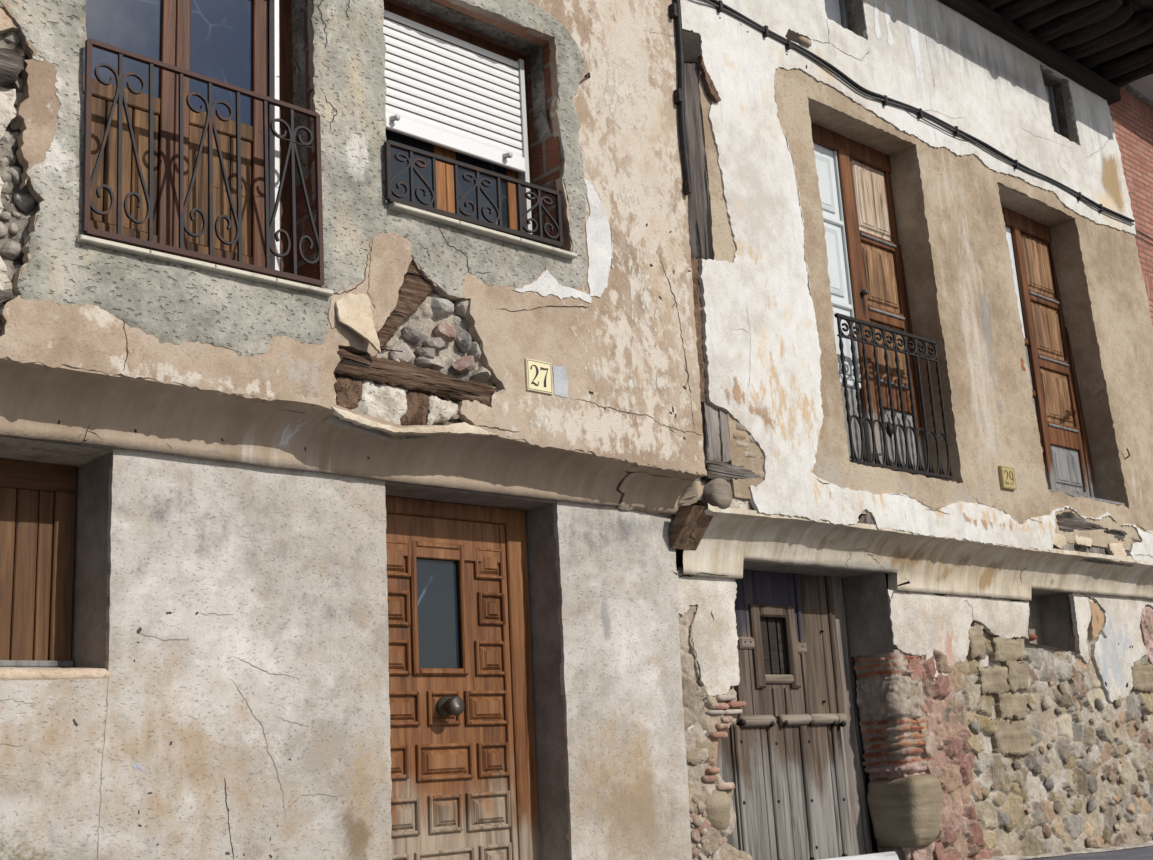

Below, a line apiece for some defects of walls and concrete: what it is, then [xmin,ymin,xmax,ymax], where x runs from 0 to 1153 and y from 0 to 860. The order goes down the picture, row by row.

flaking render [0,7,39,334]
water stain [1103,157,1122,208]
flaking render [322,235,499,443]
flaking render [628,30,775,551]
flaking render [857,514,874,525]
flaking render [1053,511,1141,567]
crack [225,781,234,857]
crack [232,657,341,817]
flaking render [679,605,753,860]
flaking render [853,593,1153,860]